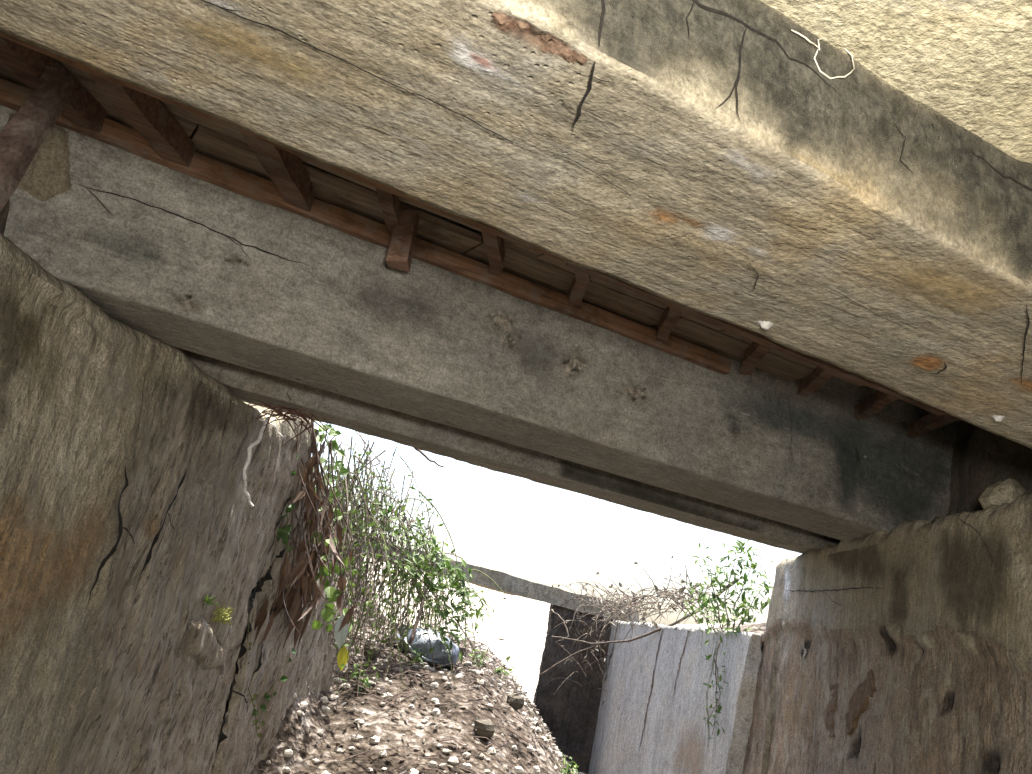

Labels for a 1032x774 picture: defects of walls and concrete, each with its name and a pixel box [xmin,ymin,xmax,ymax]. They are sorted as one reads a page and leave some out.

crack [201,0,632,198]
crack [686,0,833,125]
water stain [581,0,1032,272]
crack [74,182,314,268]
water stain [757,320,774,330]
crack [1021,303,1030,384]
crack [88,466,187,604]
crack [192,492,302,772]
crack [788,587,882,606]
water stain [942,538,1006,631]
flaking render [1003,525,1032,620]
flaking render [742,618,1032,774]